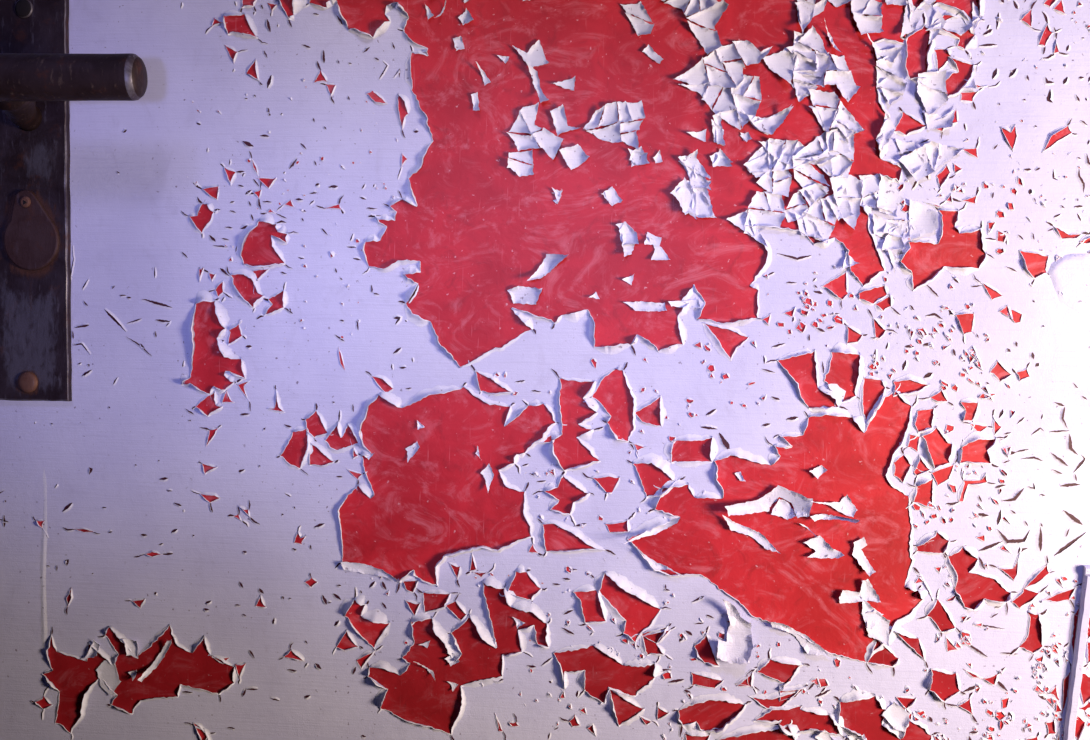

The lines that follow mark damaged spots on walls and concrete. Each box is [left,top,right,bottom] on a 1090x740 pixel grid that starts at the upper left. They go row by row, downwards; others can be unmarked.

peeling [246,59,262,86]
peeling [180,151,345,447]
peeling [267,0,1090,740]
peeling [198,462,218,474]
peeling [191,489,221,513]
peeling [227,500,260,527]
peeling [255,594,267,609]
peeling [30,624,246,740]